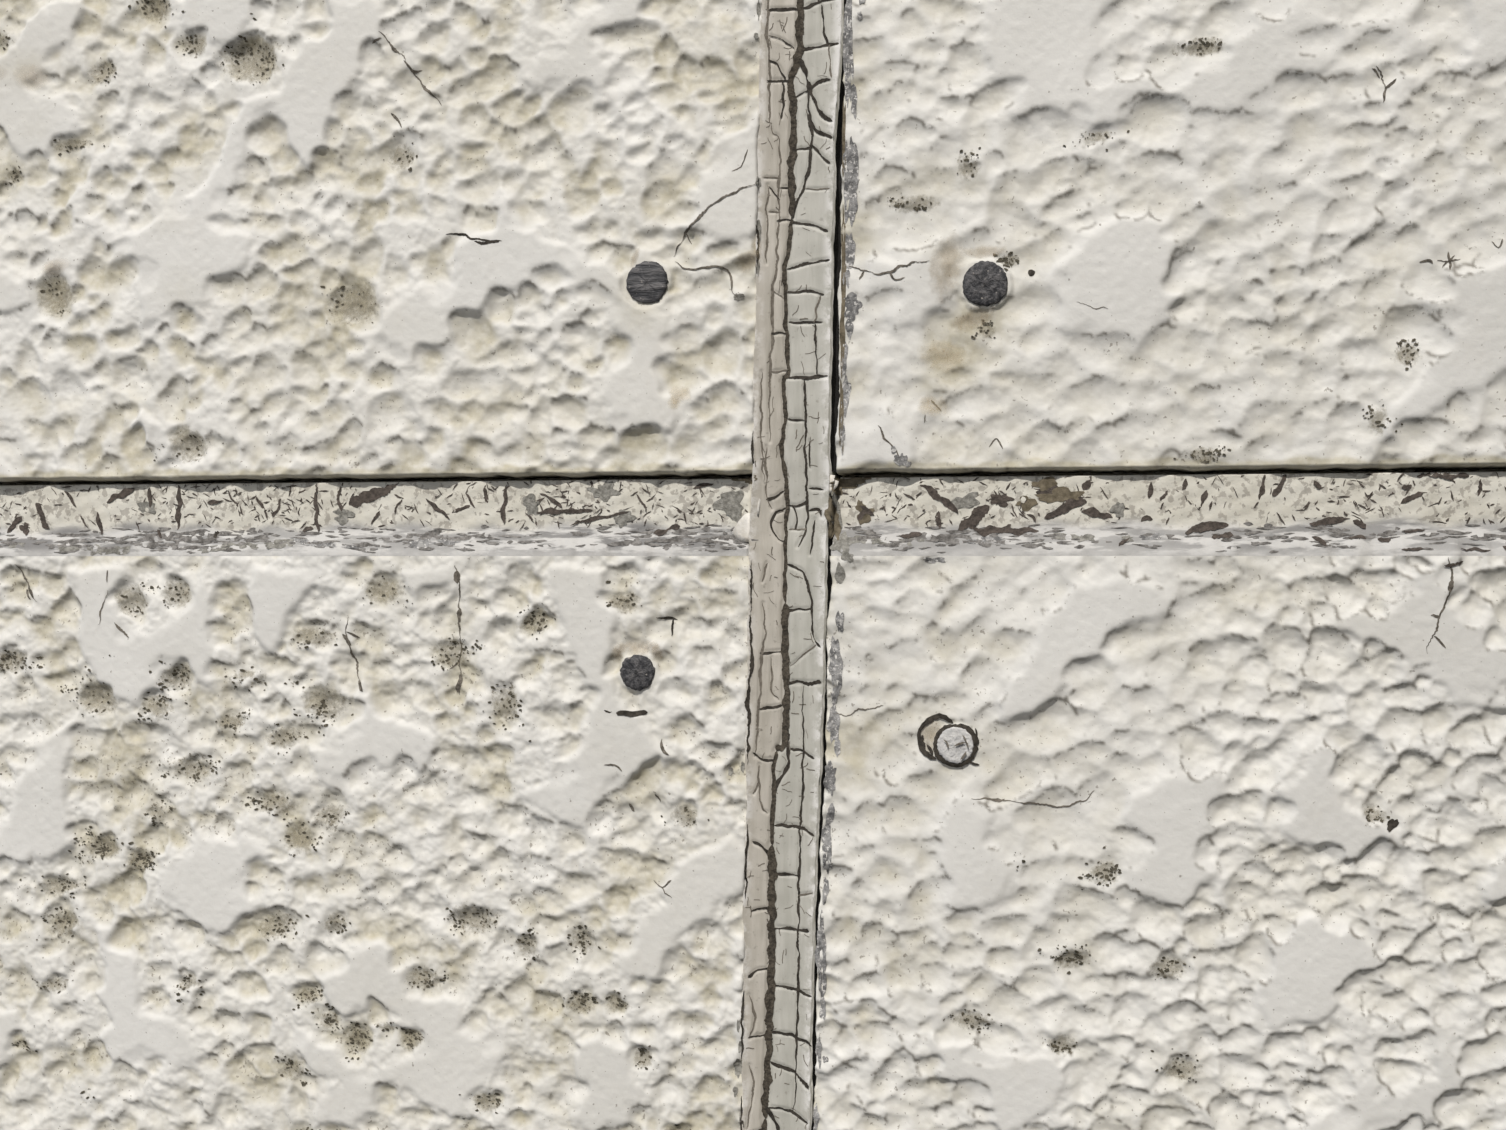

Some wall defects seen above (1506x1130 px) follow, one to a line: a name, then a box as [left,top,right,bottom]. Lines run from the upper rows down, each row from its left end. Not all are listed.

spalling [57,485,183,555]
peeling [197,484,402,553]
peeling [426,480,647,528]
crack [675,0,929,1130]
peeling [824,475,1233,584]
spalling [1309,516,1424,551]
leakage [137,660,190,721]
leakage [215,666,353,763]
crack [917,713,1095,808]
leakage [245,784,350,857]
mould [40,826,160,942]
leakage [292,986,424,1062]